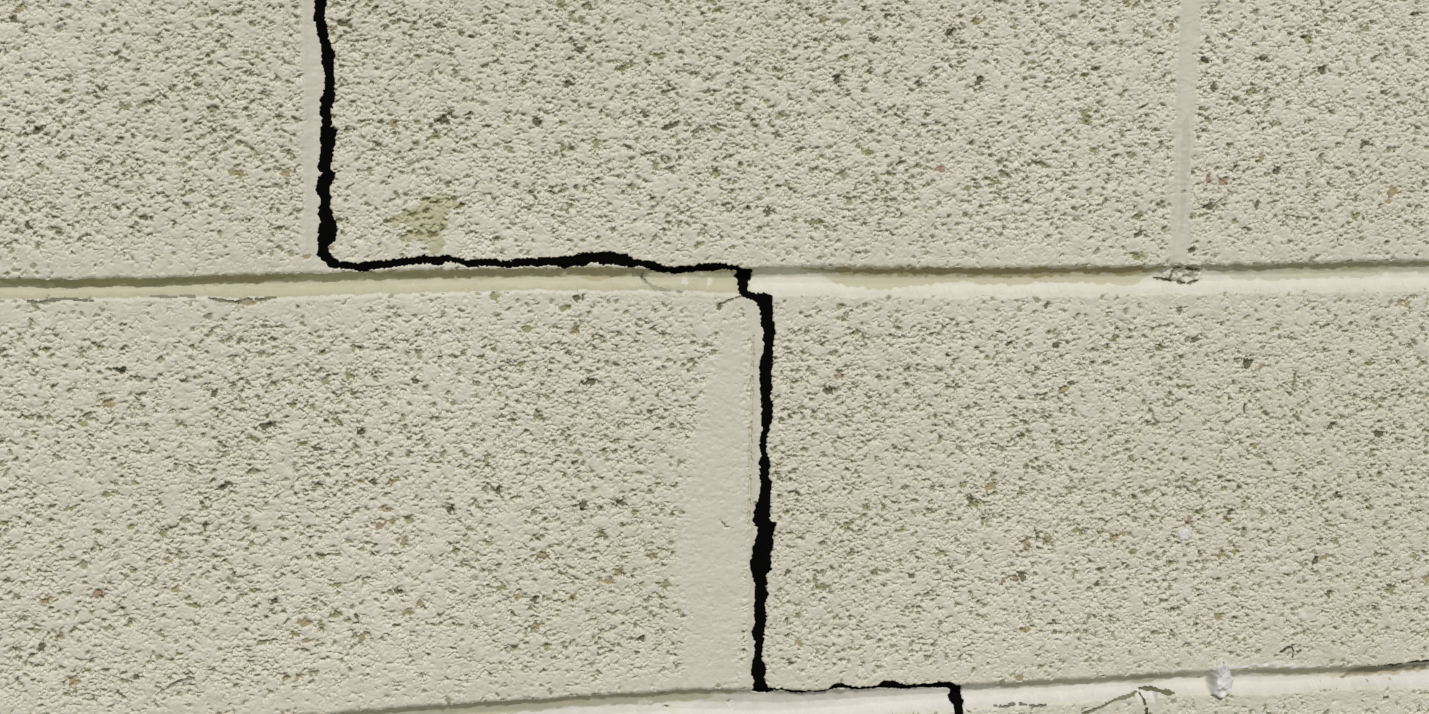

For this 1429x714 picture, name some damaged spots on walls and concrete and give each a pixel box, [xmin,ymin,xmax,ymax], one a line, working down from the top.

crack [313,0,1047,714]
crack [1082,686,1175,714]